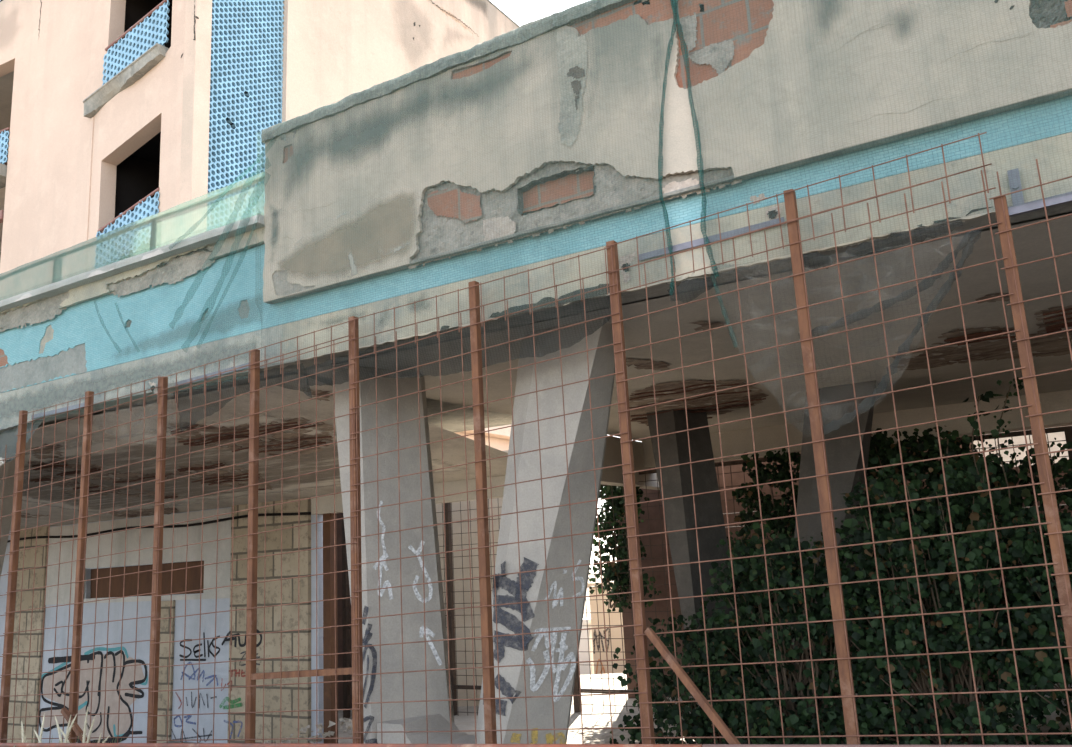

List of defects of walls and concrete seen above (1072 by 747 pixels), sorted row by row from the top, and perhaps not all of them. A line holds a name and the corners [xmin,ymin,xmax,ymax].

spalling [1029,0,1072,29]
spalling [556,0,774,148]
spalling [408,162,742,269]
spalling [750,193,781,220]
spalling [108,243,218,297]
spalling [0,292,87,393]